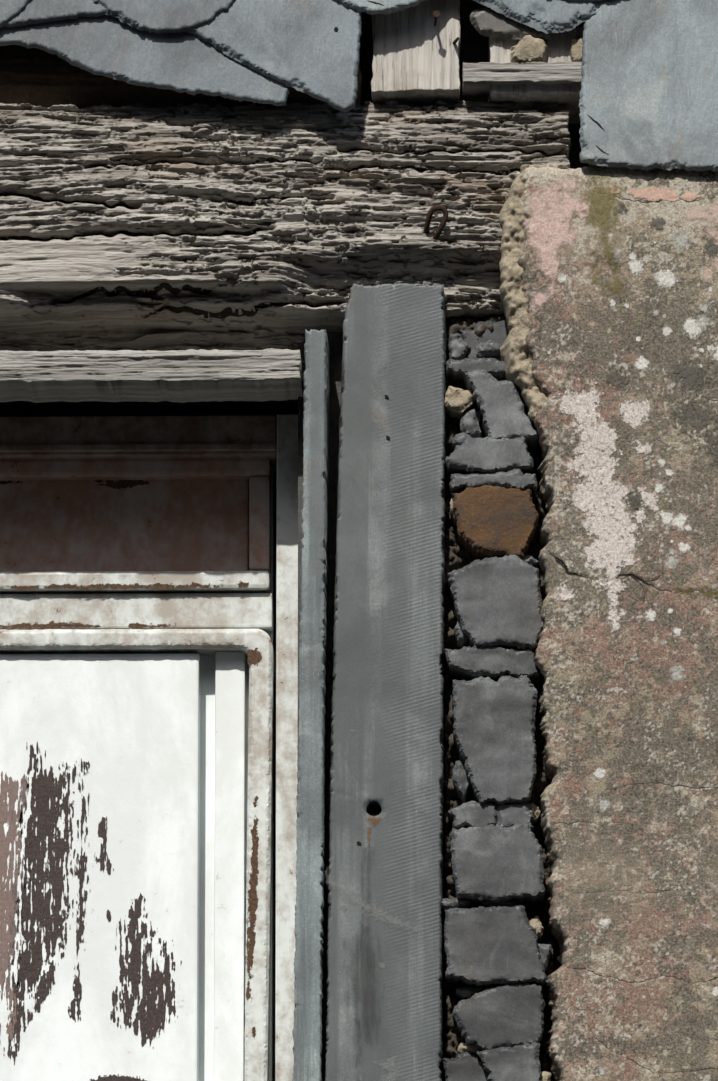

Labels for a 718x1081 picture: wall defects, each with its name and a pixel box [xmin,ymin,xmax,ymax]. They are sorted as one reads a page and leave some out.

crack [550,553,704,602]
peeling [0,741,114,1065]
peeling [106,893,182,1046]
rust [244,796,259,1002]